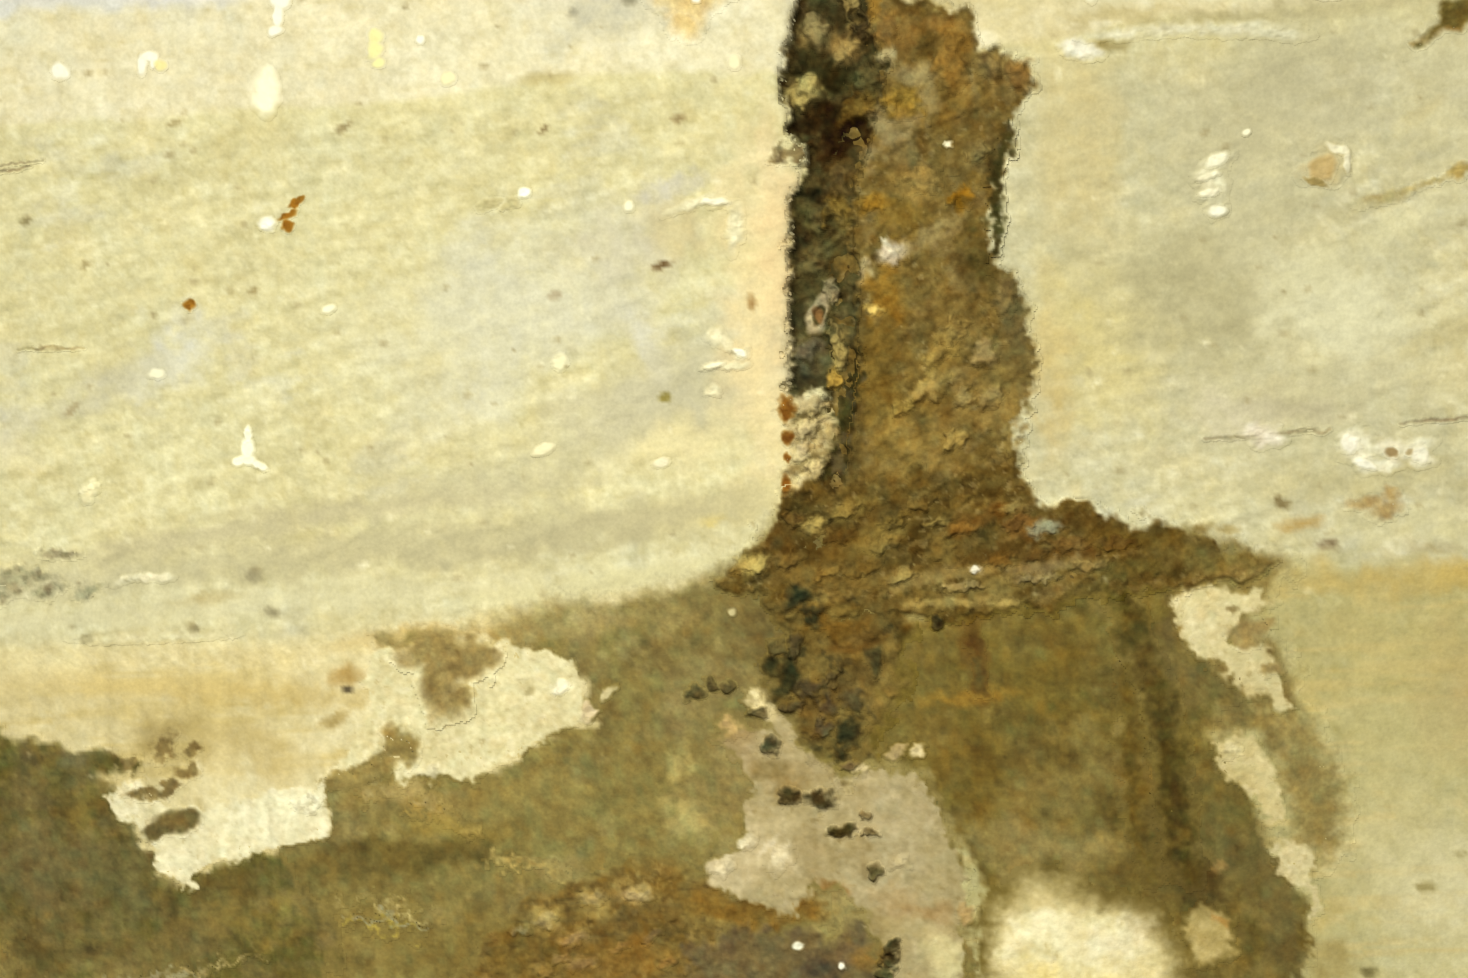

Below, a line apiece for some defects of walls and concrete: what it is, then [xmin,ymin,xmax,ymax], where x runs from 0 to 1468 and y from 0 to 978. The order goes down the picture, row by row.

corrosion [276,194,306,234]
corrosion [770,391,801,499]
spalling [682,0,1325,978]
peeling [100,636,620,895]
water stain [0,506,784,978]
water stain [869,515,1360,978]